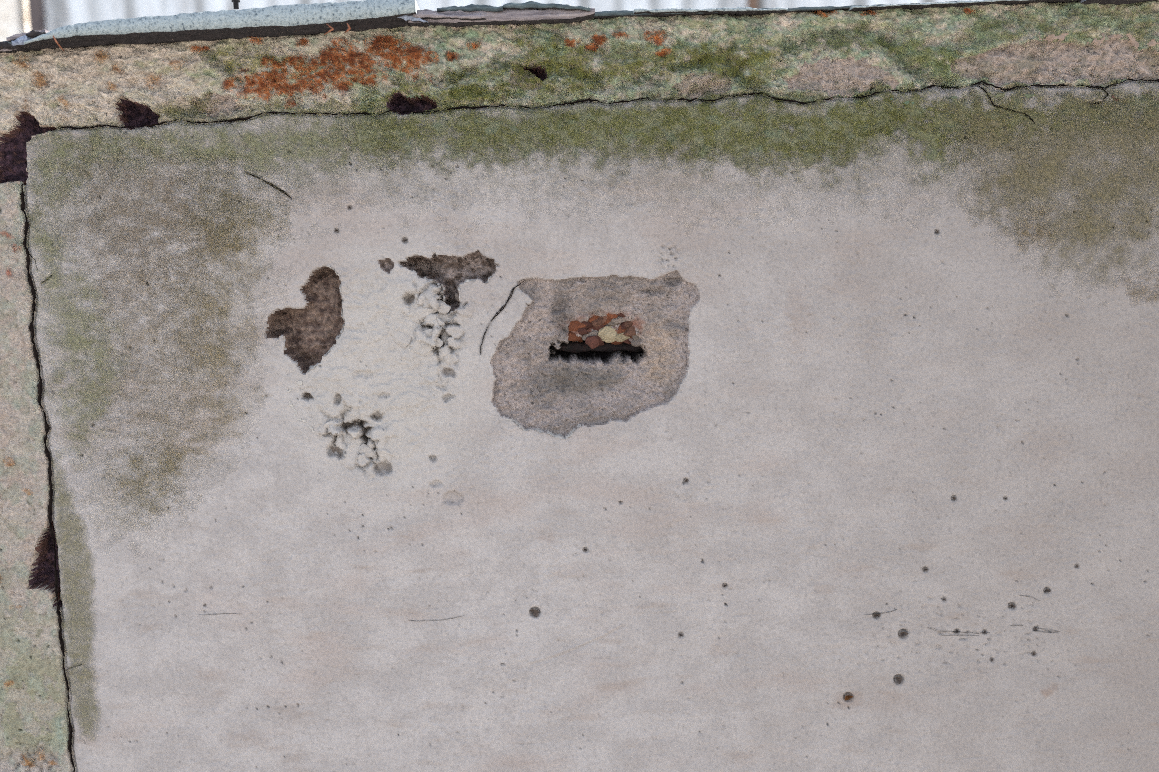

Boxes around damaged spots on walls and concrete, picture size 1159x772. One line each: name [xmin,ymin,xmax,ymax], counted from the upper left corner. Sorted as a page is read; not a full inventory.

corrosion [223,35,457,107]
corrosion [565,32,628,51]
crack [53,78,1159,131]
corrosion [645,31,670,56]
crack [248,173,290,197]
leakage [969,108,1159,264]
crack [480,280,525,354]
spalling [265,251,496,485]
spalling [490,270,700,439]
crack [21,184,82,772]